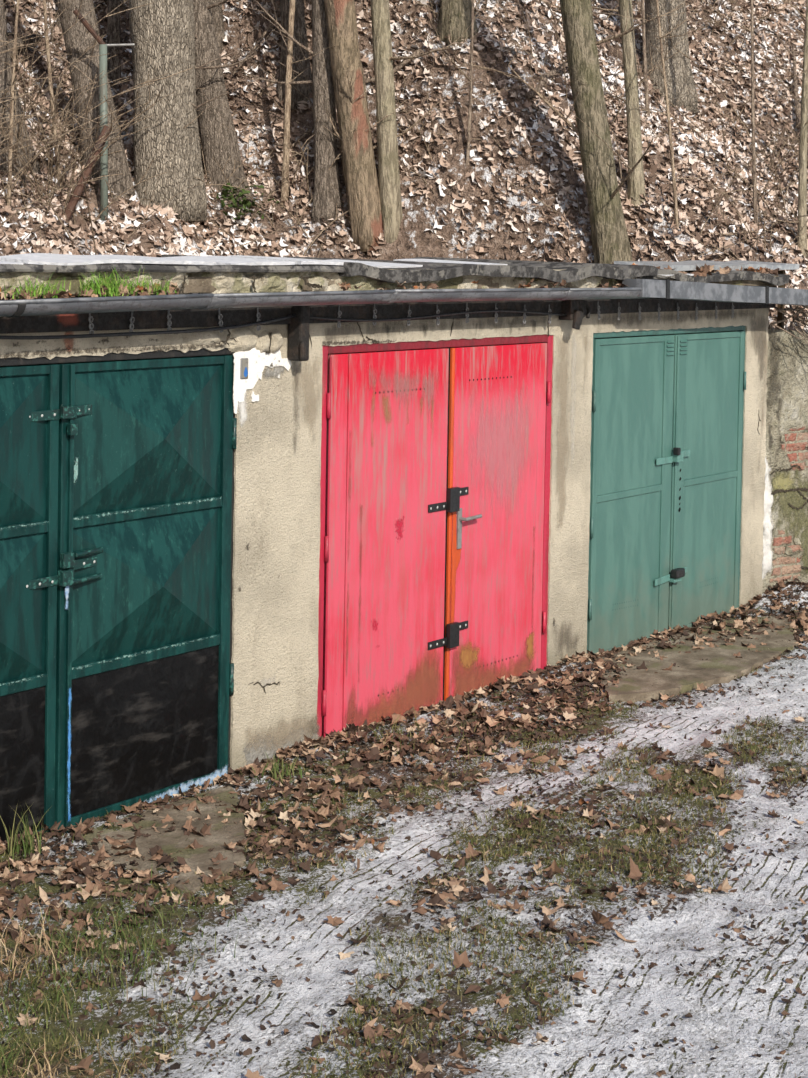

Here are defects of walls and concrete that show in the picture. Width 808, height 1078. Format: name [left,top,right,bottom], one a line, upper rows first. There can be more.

peeling [0,336,292,423]
crack [771,447,808,510]
peeling [781,427,808,471]
peeling [762,457,803,583]
corrosion [347,659,438,726]
corrosion [454,635,534,696]